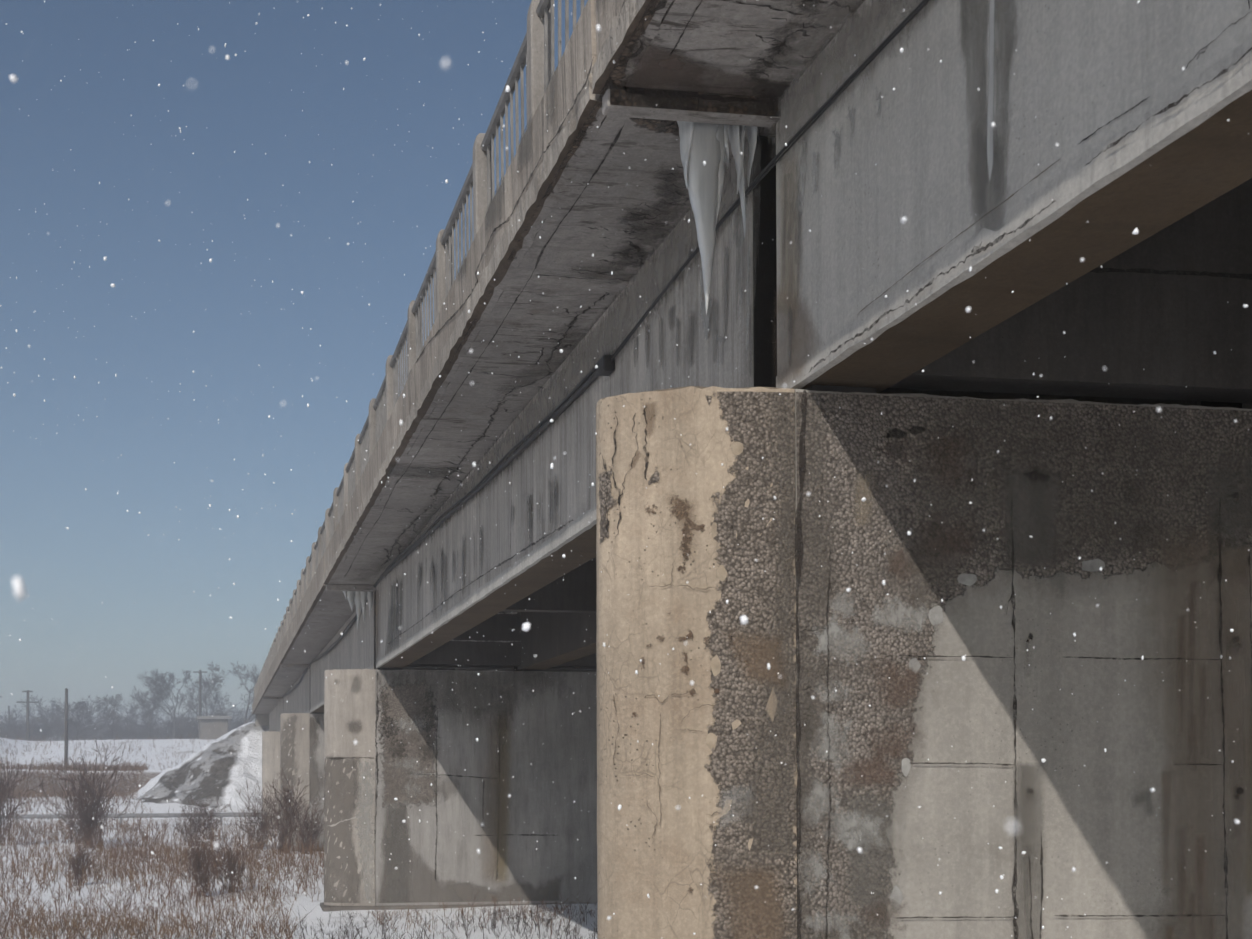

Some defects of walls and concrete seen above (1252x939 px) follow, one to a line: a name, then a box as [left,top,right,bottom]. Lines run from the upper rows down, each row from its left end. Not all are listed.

crack [407,57,594,377]
crack [670,0,857,77]
water stain [620,0,919,241]
crack [388,499,573,644]
crack [344,125,688,582]
water stain [391,213,750,566]
peeling [599,404,659,544]
water stain [818,623,848,651]
spalling [641,391,1252,939]
crack [795,11,1252,939]
water stain [280,715,561,903]
water stain [1028,836,1043,939]